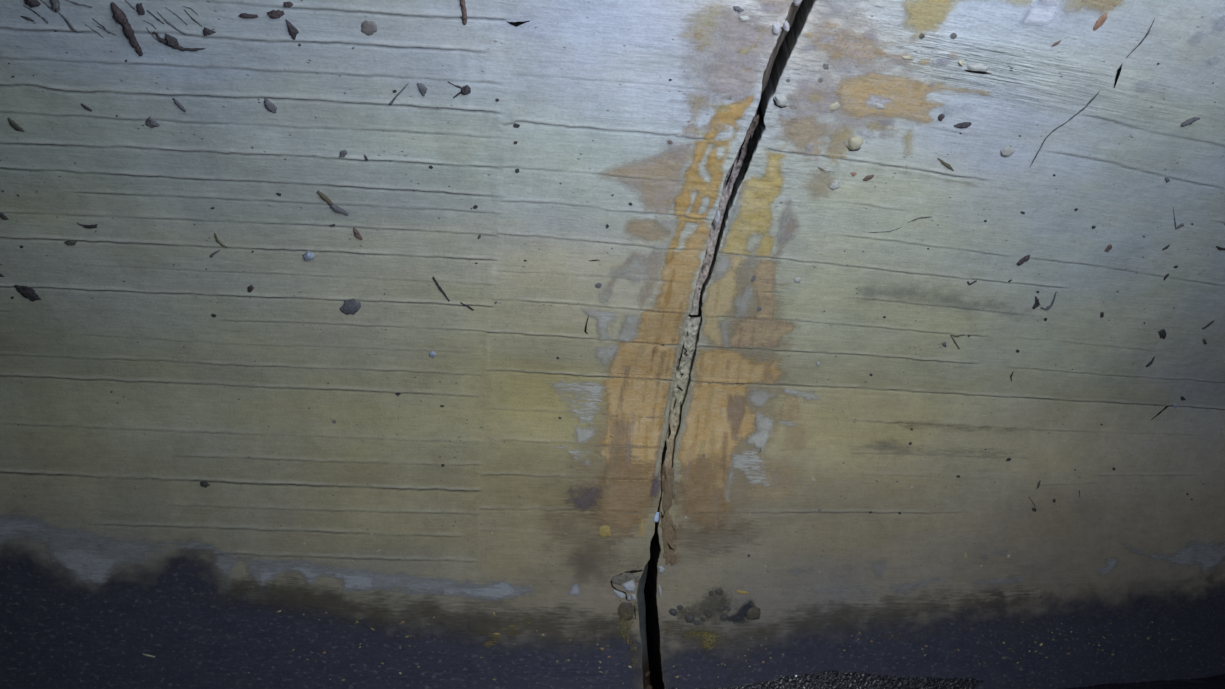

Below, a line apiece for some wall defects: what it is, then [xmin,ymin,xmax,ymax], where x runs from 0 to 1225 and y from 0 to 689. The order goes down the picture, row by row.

corrosion [781,24,987,158]
corrosion [905,0,952,31]
corrosion [591,96,753,537]
crack [660,2,801,491]
corrosion [678,152,800,531]
leakage [0,514,643,689]
crack [637,562,653,689]
leakage [662,578,1225,689]